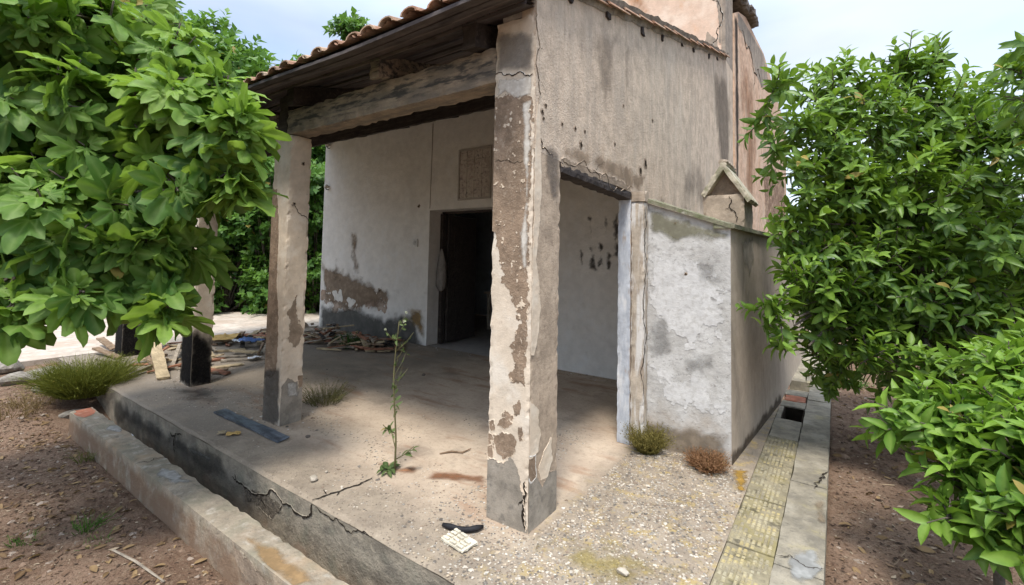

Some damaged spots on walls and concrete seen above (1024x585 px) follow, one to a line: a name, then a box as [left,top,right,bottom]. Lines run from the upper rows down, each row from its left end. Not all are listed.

crack [494,8,545,105]
crack [541,139,632,192]
flaking render [265,188,303,372]
flaking render [320,286,388,314]
peeling [649,253,727,350]
peeling [649,364,726,414]
crack [233,474,372,537]
flaking render [486,400,557,534]